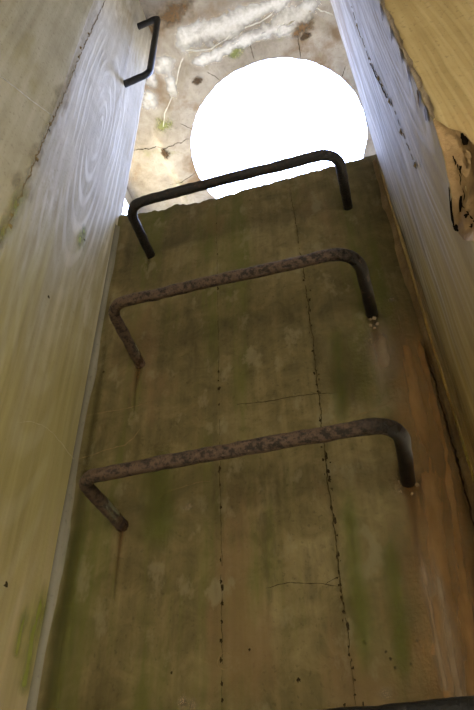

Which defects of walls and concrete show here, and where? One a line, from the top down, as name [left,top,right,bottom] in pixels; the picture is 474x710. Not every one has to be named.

spalling [380,0,474,241]
crack [237,187,332,427]
crack [269,444,364,706]
rust [399,332,474,699]